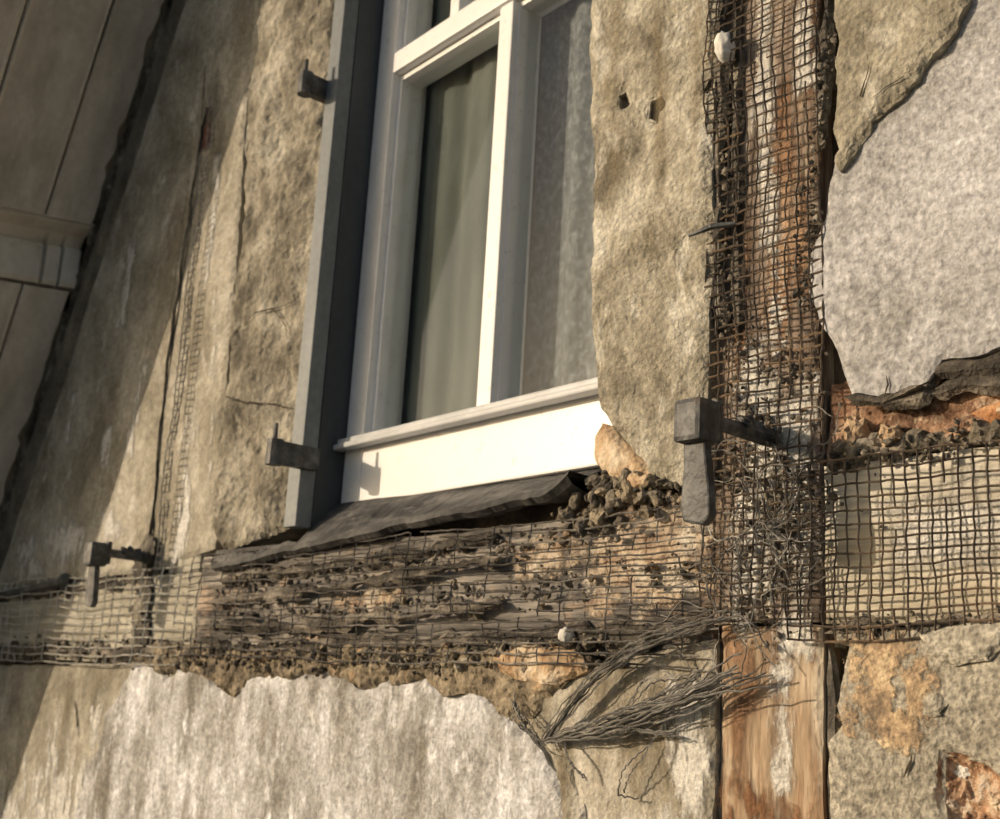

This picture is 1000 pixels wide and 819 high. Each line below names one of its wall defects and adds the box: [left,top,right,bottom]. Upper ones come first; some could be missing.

crack [859,61,904,102]
corrosion [763,0,816,348]
spalling [809,0,1000,463]
peeling [100,424,112,468]
spalling [594,423,670,490]
peeling [14,519,87,583]
peeling [102,509,123,540]
peeling [170,466,192,569]
corrosion [729,636,758,757]
spalling [838,622,1000,756]
corrosion [721,778,812,819]
spalling [935,752,1000,819]